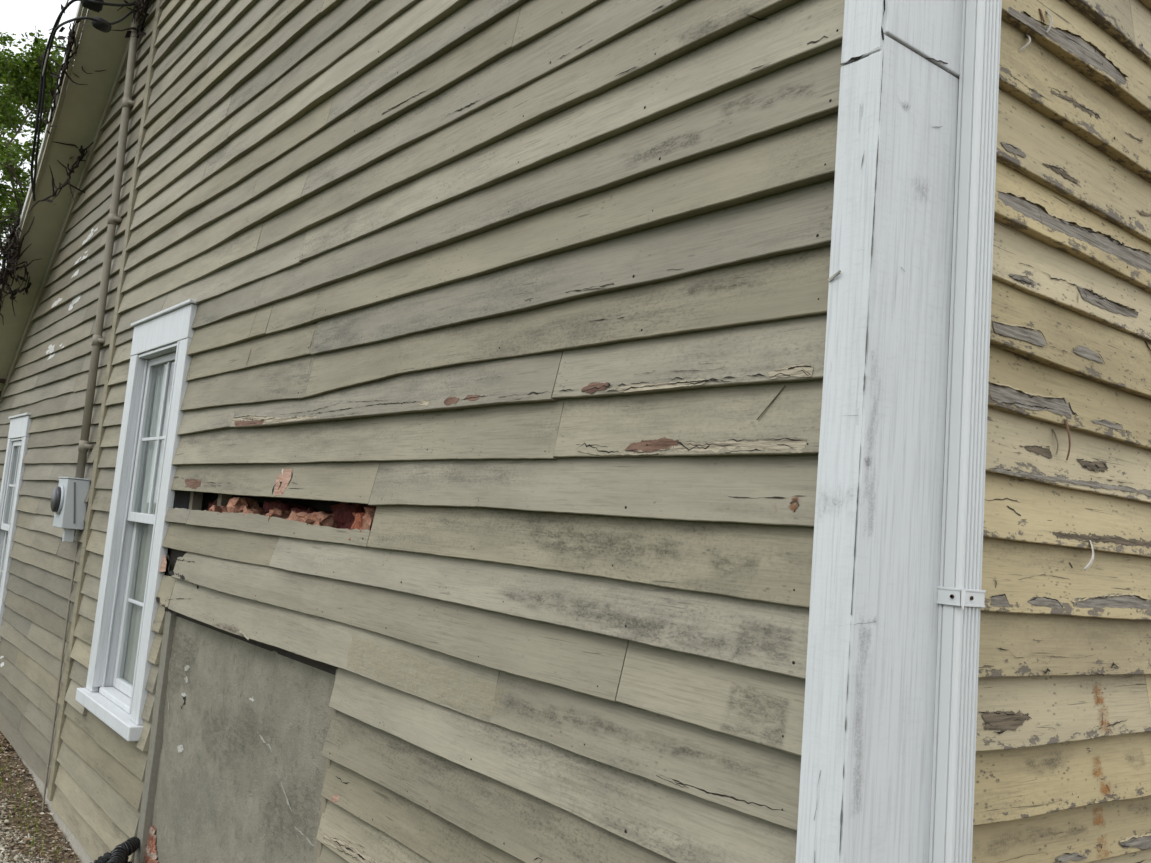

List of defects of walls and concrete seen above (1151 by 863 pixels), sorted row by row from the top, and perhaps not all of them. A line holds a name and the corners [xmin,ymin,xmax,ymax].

peeling [1007,7,1128,85]
peeling [998,190,1151,273]
peeling [1010,263,1151,319]
peeling [993,321,1130,371]
peeling [581,378,706,394]
peeling [989,381,1123,430]
peeling [625,437,807,453]
peeling [989,445,1151,496]
spalling [174,468,377,540]
peeling [1019,540,1094,580]
peeling [990,594,1010,607]
peeling [1027,593,1151,609]